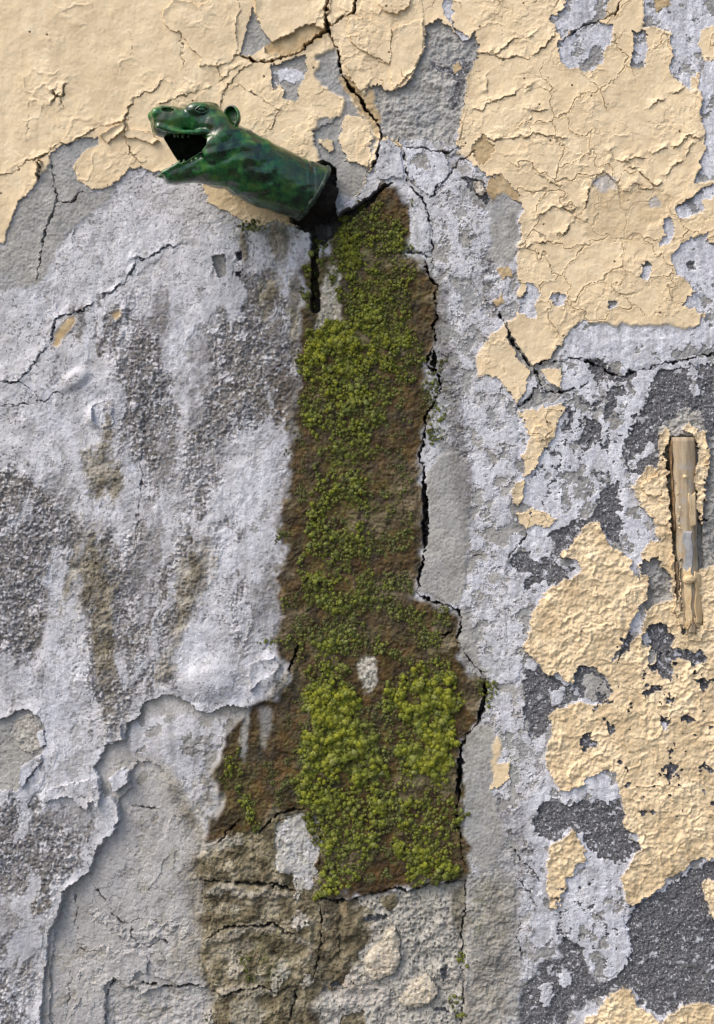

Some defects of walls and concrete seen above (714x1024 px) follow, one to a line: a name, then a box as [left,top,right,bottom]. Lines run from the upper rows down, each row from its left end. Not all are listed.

peeling [0,122,160,293]
spalling [163,0,480,313]
peeling [462,174,522,281]
crack [476,0,623,63]
crack [522,135,702,250]
crack [652,90,682,107]
crack [496,307,714,415]
damp [0,181,487,901]
crack [0,0,566,1024]
peeling [506,0,714,1024]
spalling [0,709,47,793]
spalling [40,694,470,1024]